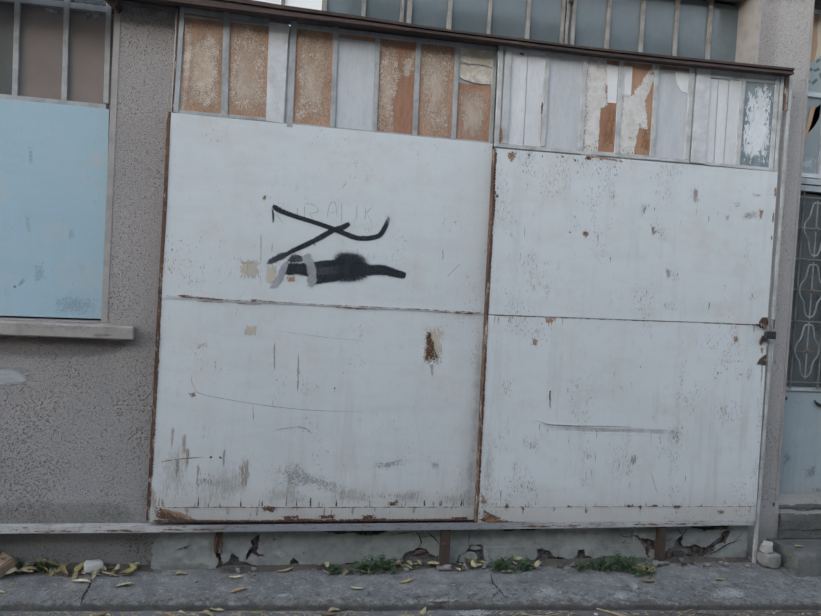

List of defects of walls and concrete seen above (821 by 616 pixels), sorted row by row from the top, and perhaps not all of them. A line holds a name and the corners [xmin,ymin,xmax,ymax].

peeling [580,58,655,159]
peeling [741,83,773,164]
rust [161,131,170,282]
rust [234,152,536,337]
rust [423,329,443,363]
rust [478,347,512,523]
rust [153,496,469,531]
rust [560,504,752,514]
spalling [215,534,265,567]
crack [393,531,440,547]
crack [667,528,743,558]